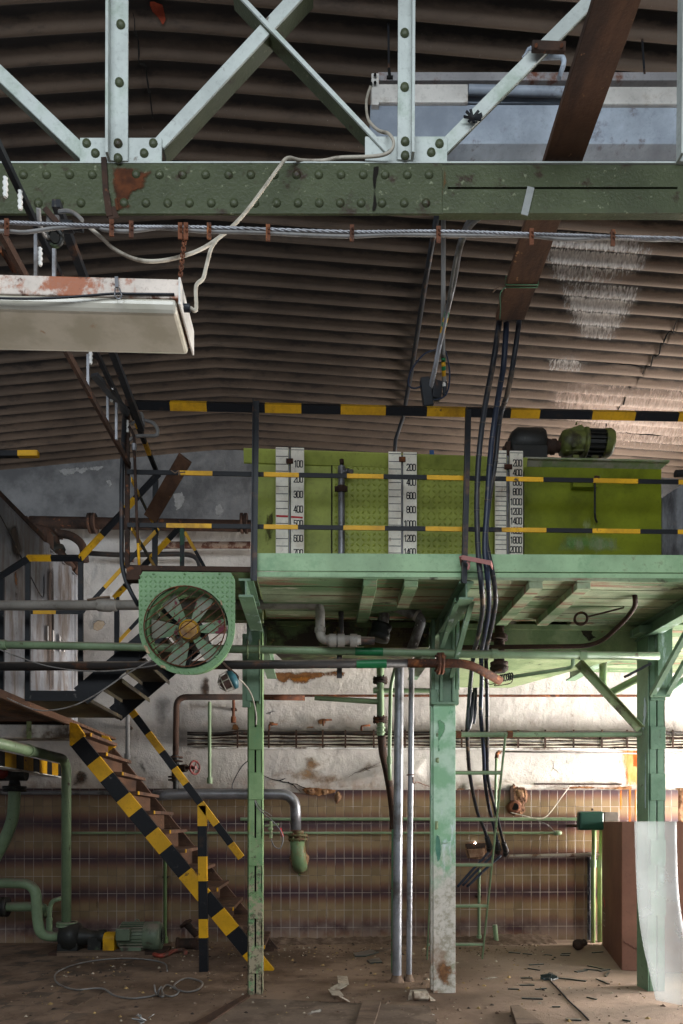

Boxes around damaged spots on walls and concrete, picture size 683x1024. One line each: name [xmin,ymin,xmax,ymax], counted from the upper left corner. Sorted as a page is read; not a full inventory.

corrosion [113,168,151,210]
efflorescence [548,233,649,339]
crack [576,318,683,437]